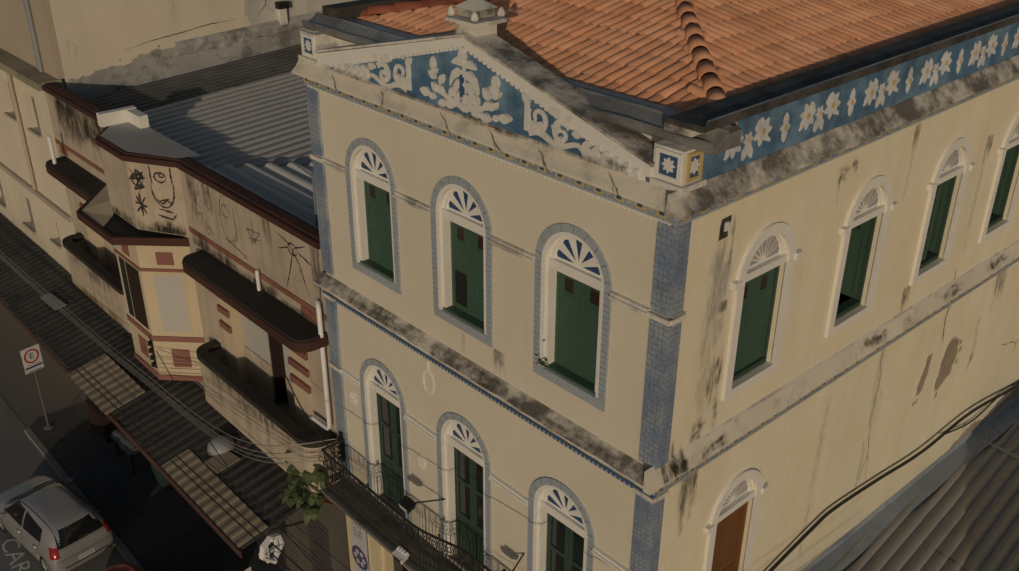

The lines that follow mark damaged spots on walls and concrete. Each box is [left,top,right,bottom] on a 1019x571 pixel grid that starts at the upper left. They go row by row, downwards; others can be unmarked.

crack [126,0,275,50]
peeling [912,336,962,406]
damp [662,450,696,509]